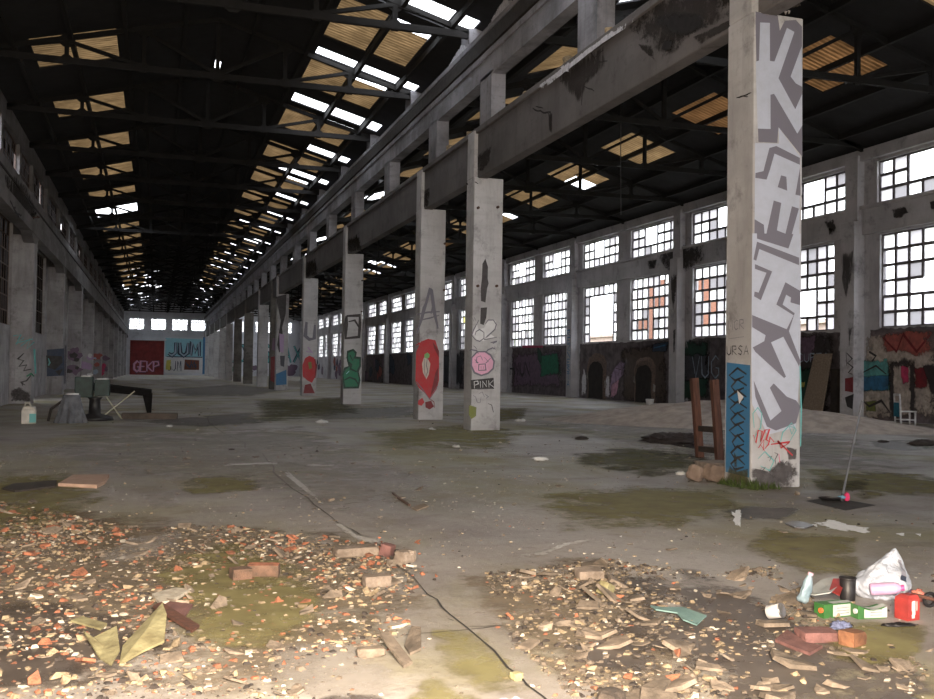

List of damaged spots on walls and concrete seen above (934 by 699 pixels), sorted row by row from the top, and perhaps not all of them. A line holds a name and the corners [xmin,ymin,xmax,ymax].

leakage [630,0,730,59]
leakage [752,447,797,488]
crack [207,412,547,699]